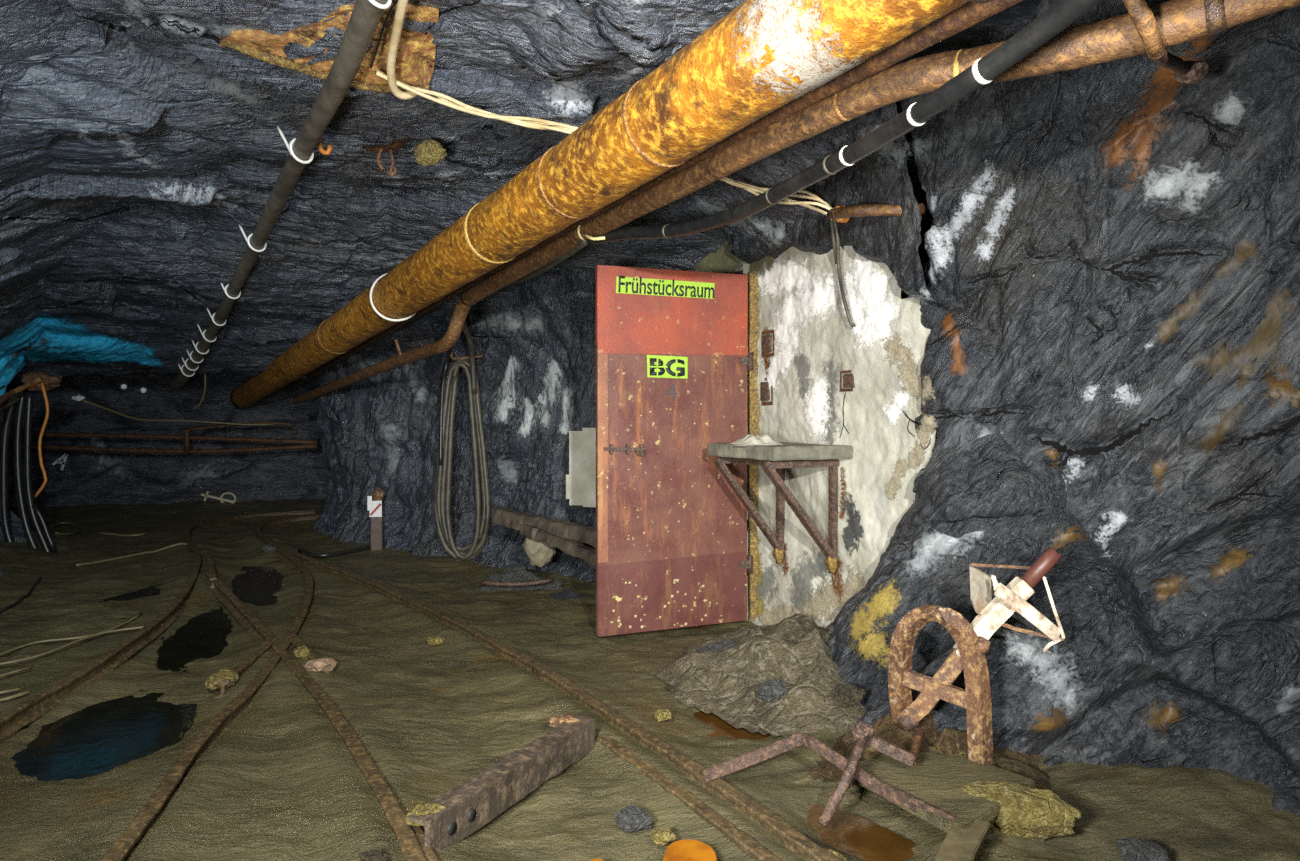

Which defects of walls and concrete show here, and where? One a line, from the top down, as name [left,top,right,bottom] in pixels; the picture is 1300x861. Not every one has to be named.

damp [693,160,1015,445]
damp [901,531,983,572]
damp [1007,621,1086,731]